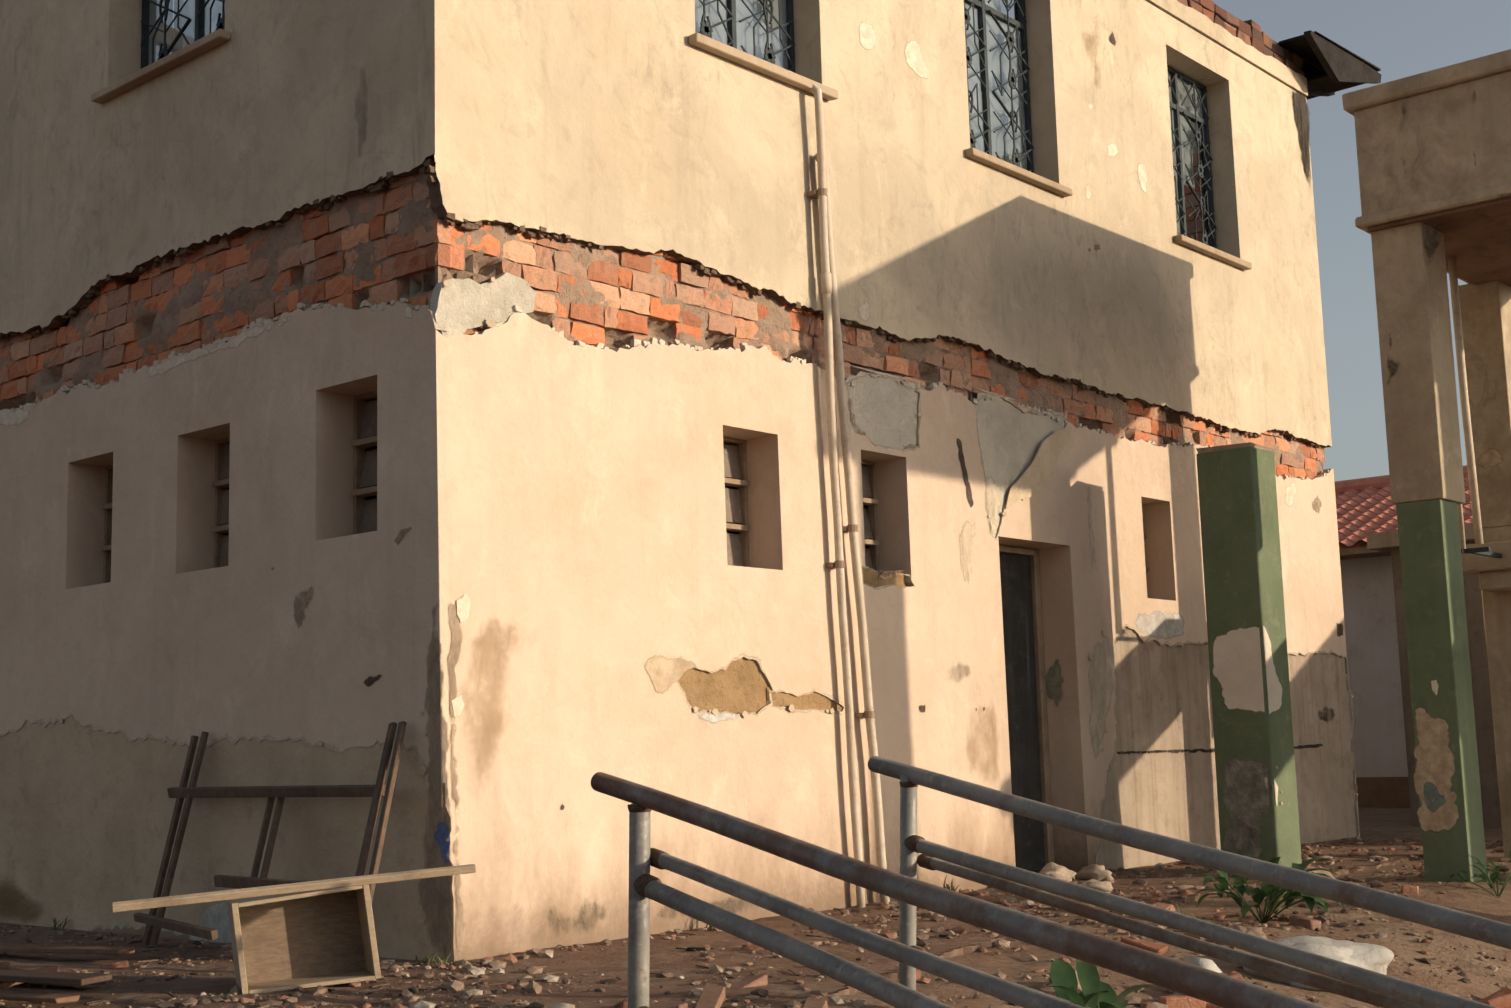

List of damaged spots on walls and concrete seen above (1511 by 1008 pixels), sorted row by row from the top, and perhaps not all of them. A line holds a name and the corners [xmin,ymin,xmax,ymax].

spalling [0,153,1329,540]
crack [957,438,974,507]
spalling [294,587,312,628]
peeling [645,653,845,723]
peeling [0,594,471,963]
peeling [1100,612,1360,859]
peeling [1414,707,1459,832]
peeling [1096,838,1181,870]
damp [0,886,38,919]